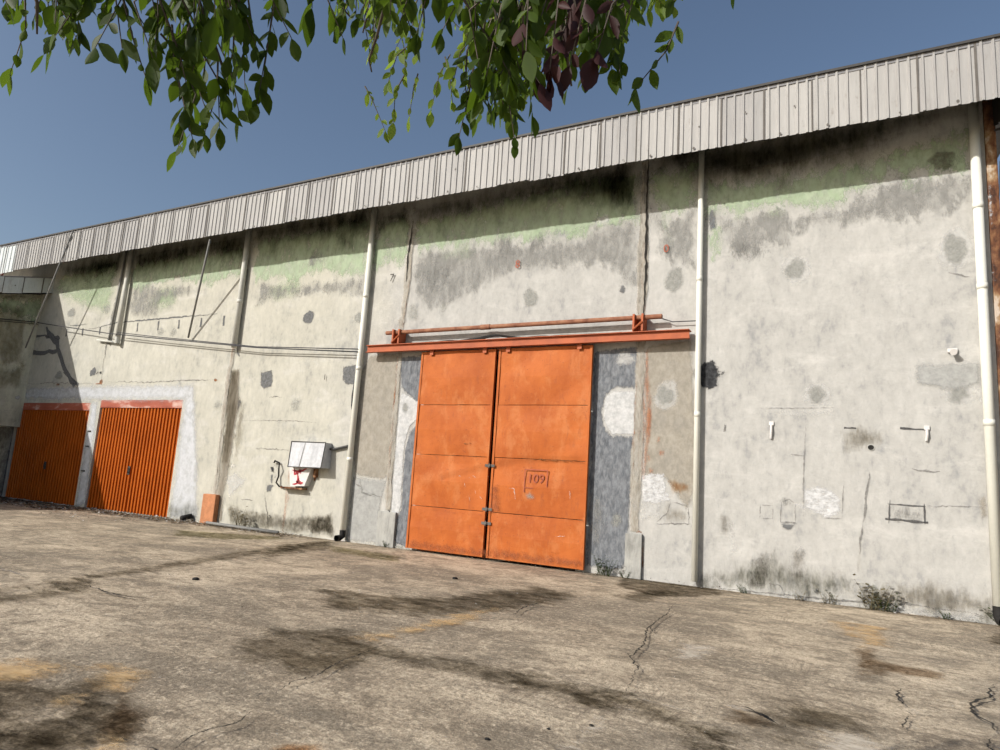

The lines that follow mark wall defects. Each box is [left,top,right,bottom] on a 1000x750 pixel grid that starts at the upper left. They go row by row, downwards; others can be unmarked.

leakage [664,118,902,176]
leakage [518,163,633,203]
leakage [257,210,367,239]
leakage [217,370,239,520]
crack [626,604,674,707]
crack [122,647,379,750]
crack [969,684,1000,750]